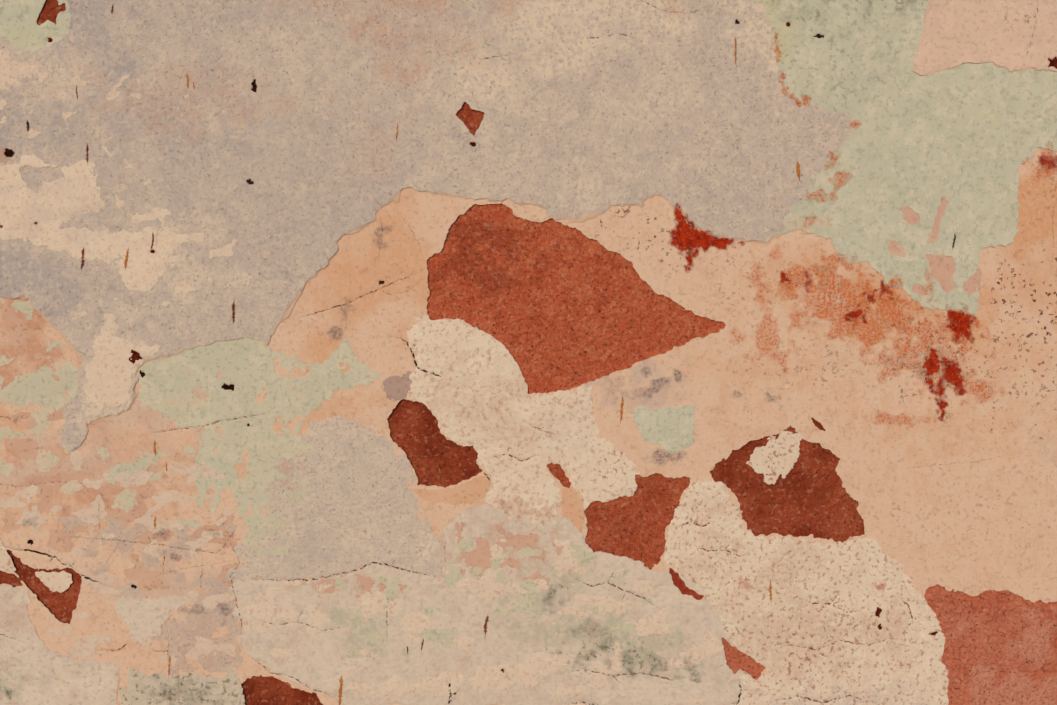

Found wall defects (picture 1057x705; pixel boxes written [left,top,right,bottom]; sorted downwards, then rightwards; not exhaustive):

flaking render [0,0,1057,472]
rust [671,204,744,270]
rust [780,256,987,421]
flaking render [0,337,766,705]
spalling [710,426,865,543]